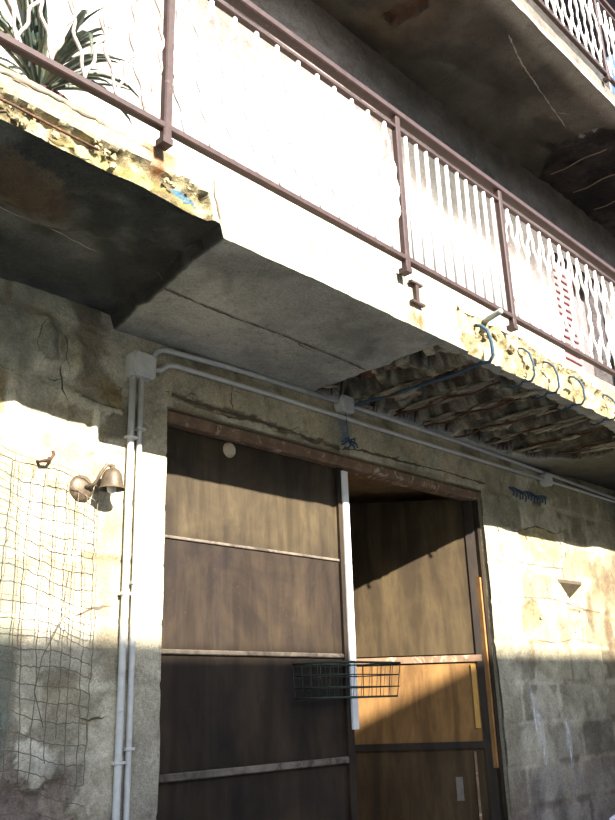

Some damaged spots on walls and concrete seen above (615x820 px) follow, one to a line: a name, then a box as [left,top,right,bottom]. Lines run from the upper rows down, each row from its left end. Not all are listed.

crack [509,36,570,127]
crack [48,335,120,409]
crack [156,272,365,370]
spalling [456,306,615,421]
flaking render [0,758,79,820]